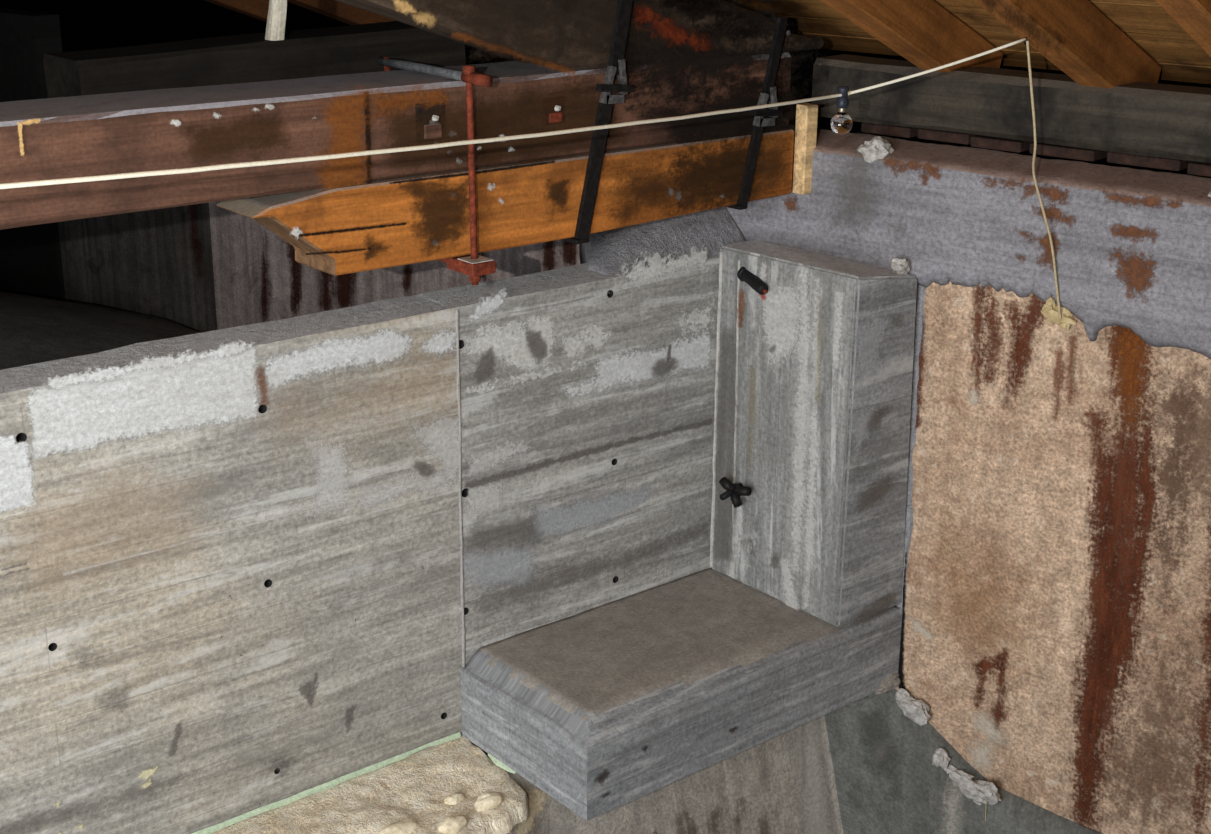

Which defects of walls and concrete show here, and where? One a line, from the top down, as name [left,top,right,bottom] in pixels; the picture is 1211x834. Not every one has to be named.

corrosion [883,158,941,185]
efflorescence [617,246,709,290]
corrosion [986,178,1075,268]
corrosion [1109,225,1160,298]
corrosion [256,369,267,405]
leakage [0,291,716,516]
corrosion [971,286,1046,403]
spalling [1041,297,1076,331]
corrosion [1071,325,1157,831]
corrosion [974,649,1008,729]
corrosion [1193,563,1211,833]
spalling [946,714,1005,805]